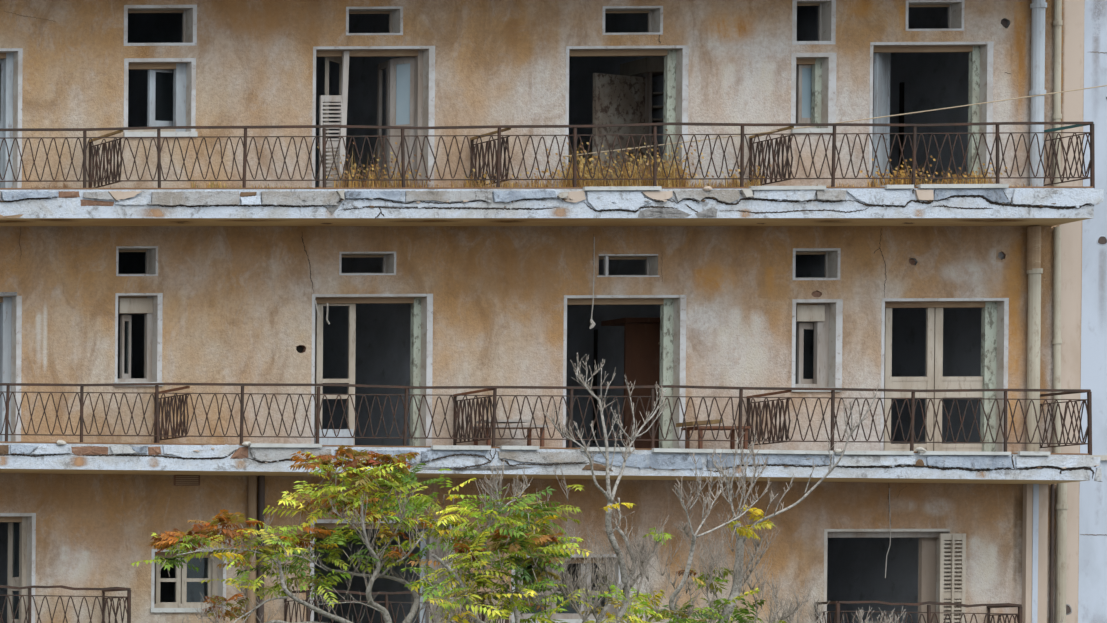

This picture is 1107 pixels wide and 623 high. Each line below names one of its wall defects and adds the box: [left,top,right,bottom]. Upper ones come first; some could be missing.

crack [0,195,58,203]
crack [152,198,558,219]
flaking render [0,188,1105,224]
crack [584,189,1094,296]
crack [0,449,344,465]
crack [704,455,1094,521]